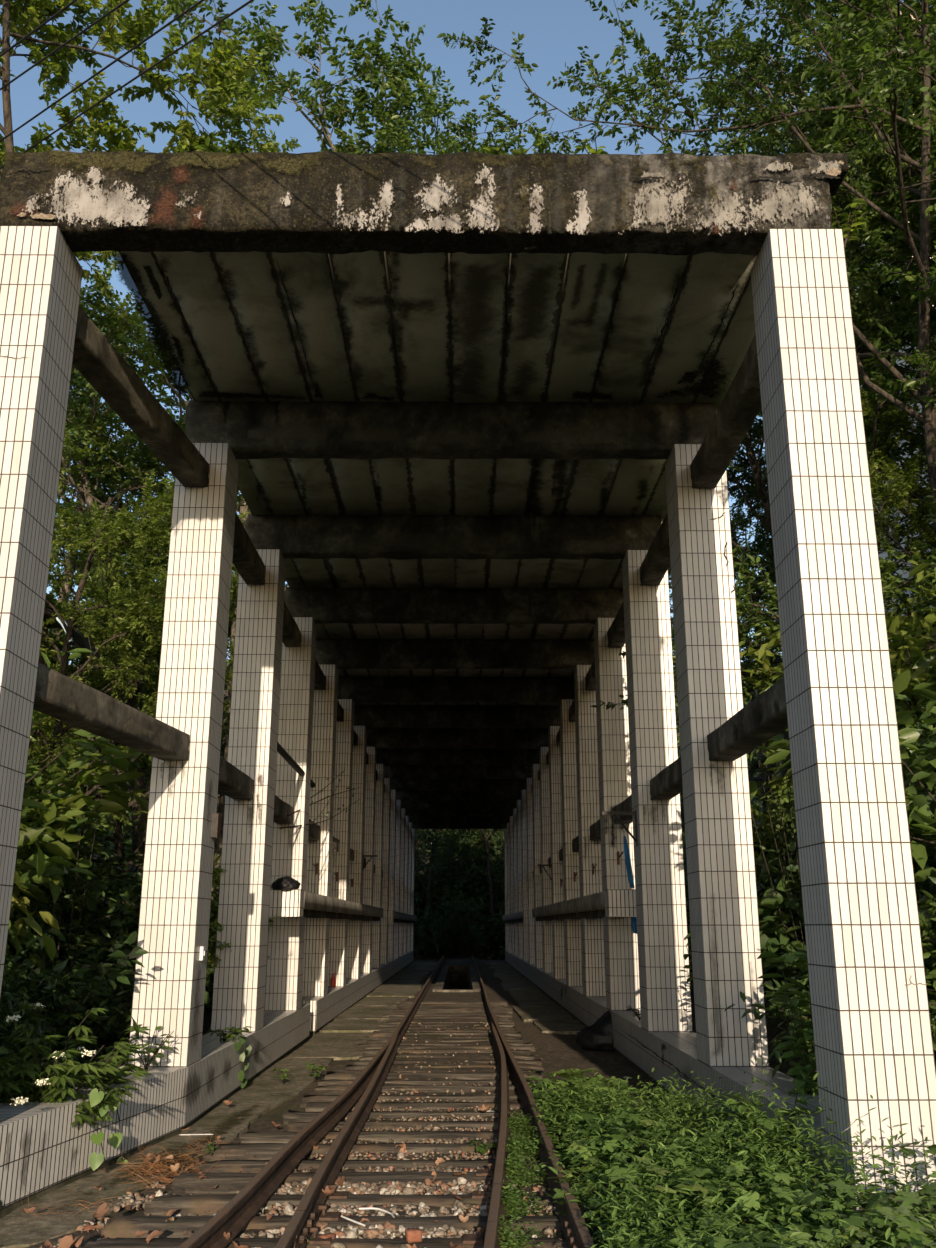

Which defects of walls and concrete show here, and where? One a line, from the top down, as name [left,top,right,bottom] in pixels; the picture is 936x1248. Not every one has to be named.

corrosion [152,169,188,221]
leakage [110,252,324,439]
leakage [446,263,552,394]
leakage [184,1048,259,1099]